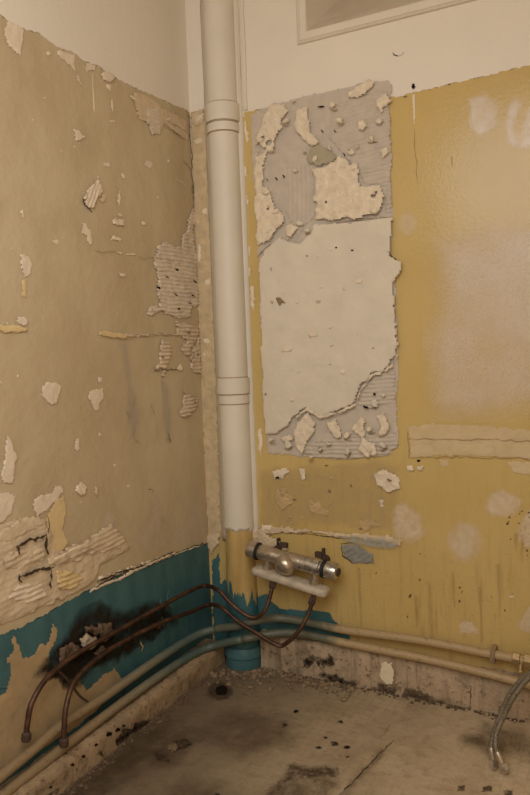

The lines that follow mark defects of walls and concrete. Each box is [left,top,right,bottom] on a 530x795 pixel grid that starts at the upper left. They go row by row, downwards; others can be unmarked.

peeling [4,20,24,56]
flaking render [83,176,107,212]
flaking render [243,79,402,480]
flaking render [0,435,130,625]
peeling [0,624,122,769]
water stain [303,655,471,710]